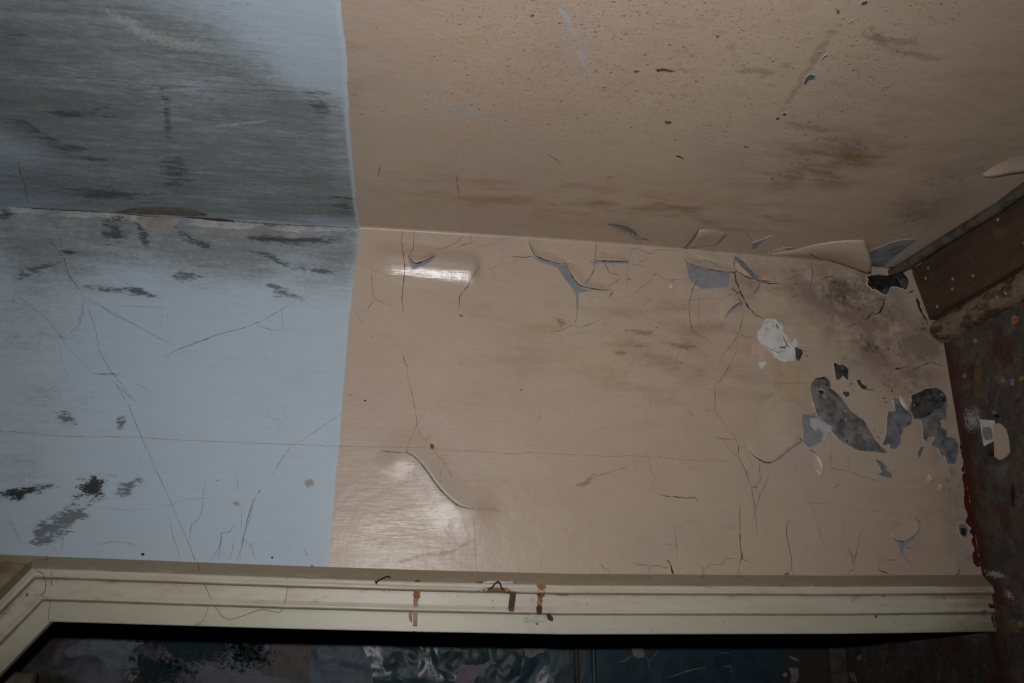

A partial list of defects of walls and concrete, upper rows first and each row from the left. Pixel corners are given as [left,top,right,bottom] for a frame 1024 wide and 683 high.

peeling [684,230,760,289]
peeling [751,235,918,296]
crack [862,291,928,323]
crack [0,206,820,581]
spalling [751,341,959,479]
crack [786,458,911,574]